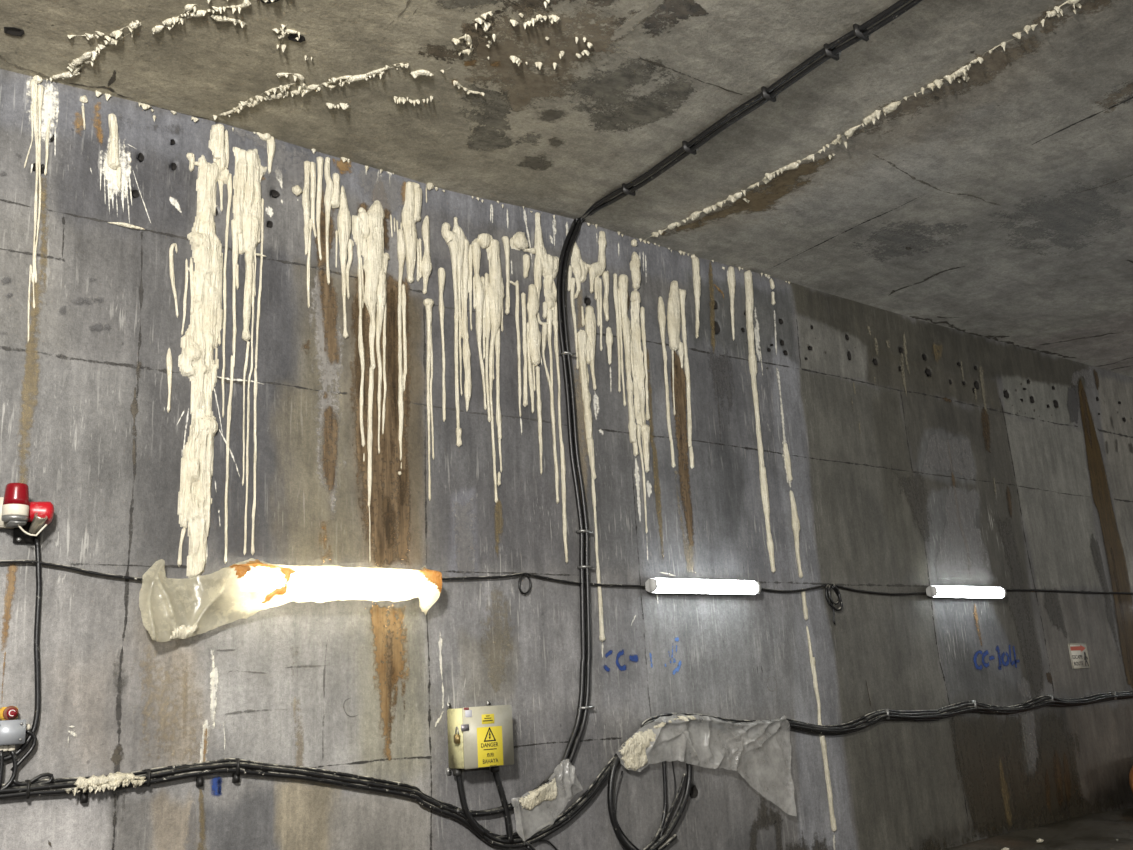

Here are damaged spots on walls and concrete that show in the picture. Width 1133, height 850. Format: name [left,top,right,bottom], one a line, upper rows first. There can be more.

leakage [19,0,275,342]
corrosion [315,182,411,567]
corrosion [370,603,409,760]
leakage [164,0,1081,658]
corrosion [671,351,694,547]
leakage [1067,368,1093,423]
corrosion [1078,369,1133,688]